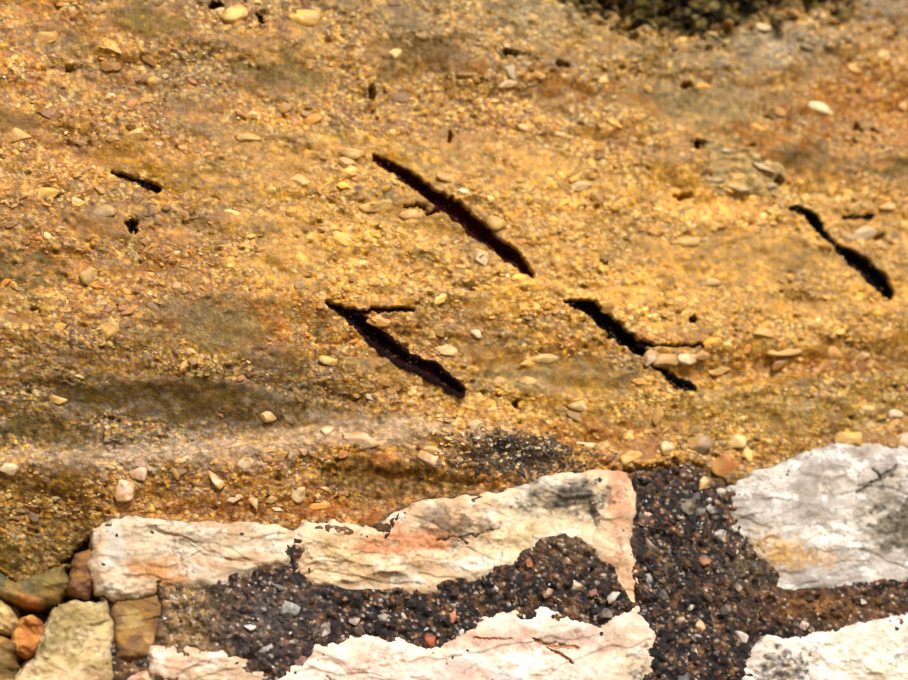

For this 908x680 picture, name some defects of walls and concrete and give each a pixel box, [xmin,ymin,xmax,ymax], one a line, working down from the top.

crack [372,154,534,279]
crack [788,205,894,301]
crack [325,302,467,399]
crack [563,300,705,391]